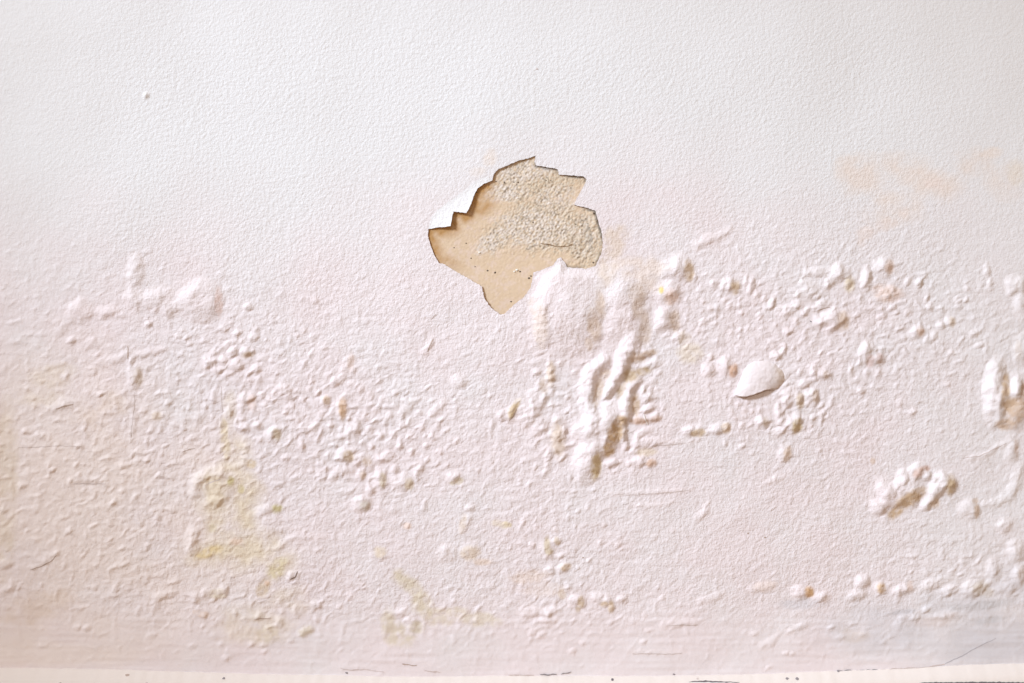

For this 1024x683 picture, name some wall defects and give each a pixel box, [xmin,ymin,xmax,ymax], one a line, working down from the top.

peeling [428,156,603,315]